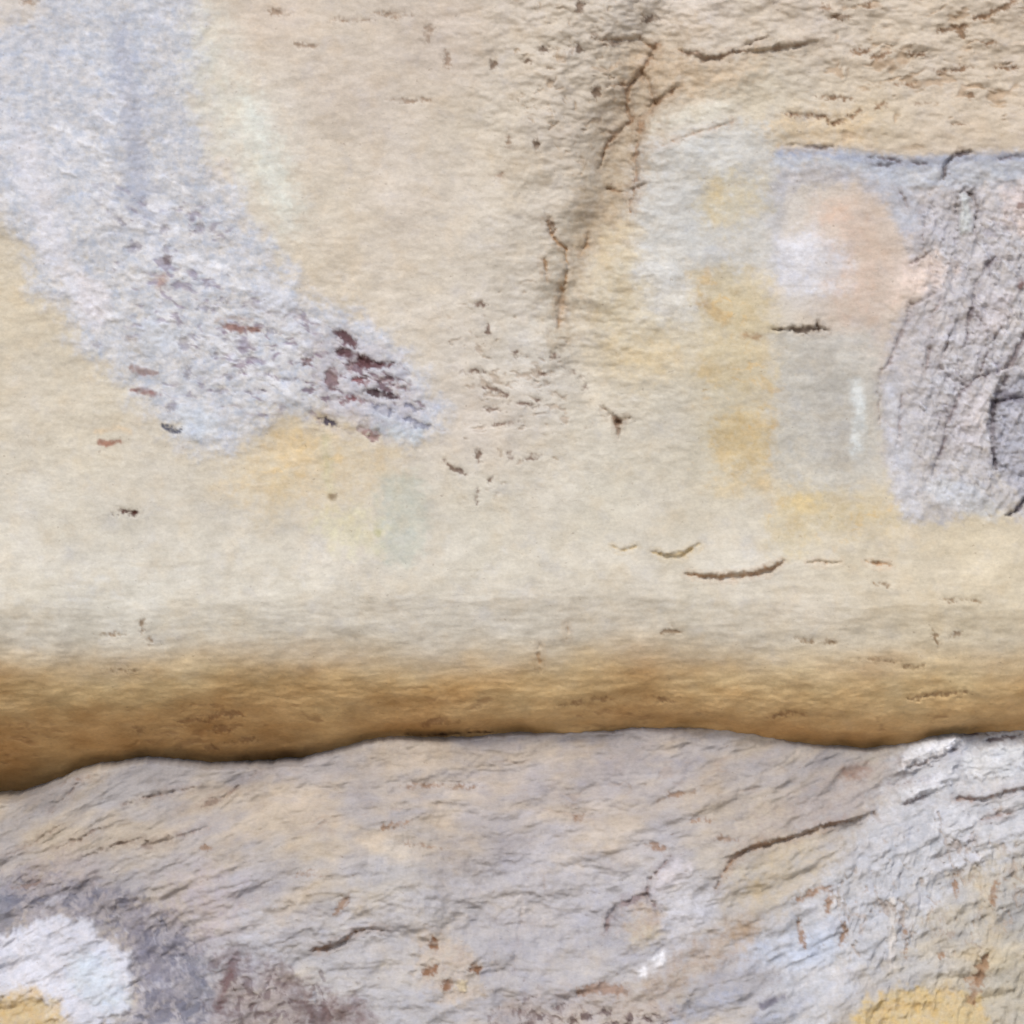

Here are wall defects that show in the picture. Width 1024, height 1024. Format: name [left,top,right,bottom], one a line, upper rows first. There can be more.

crack [534,212,596,333]
flaking render [724,0,1024,539]
crack [607,538,896,587]
crack [711,730,1024,896]